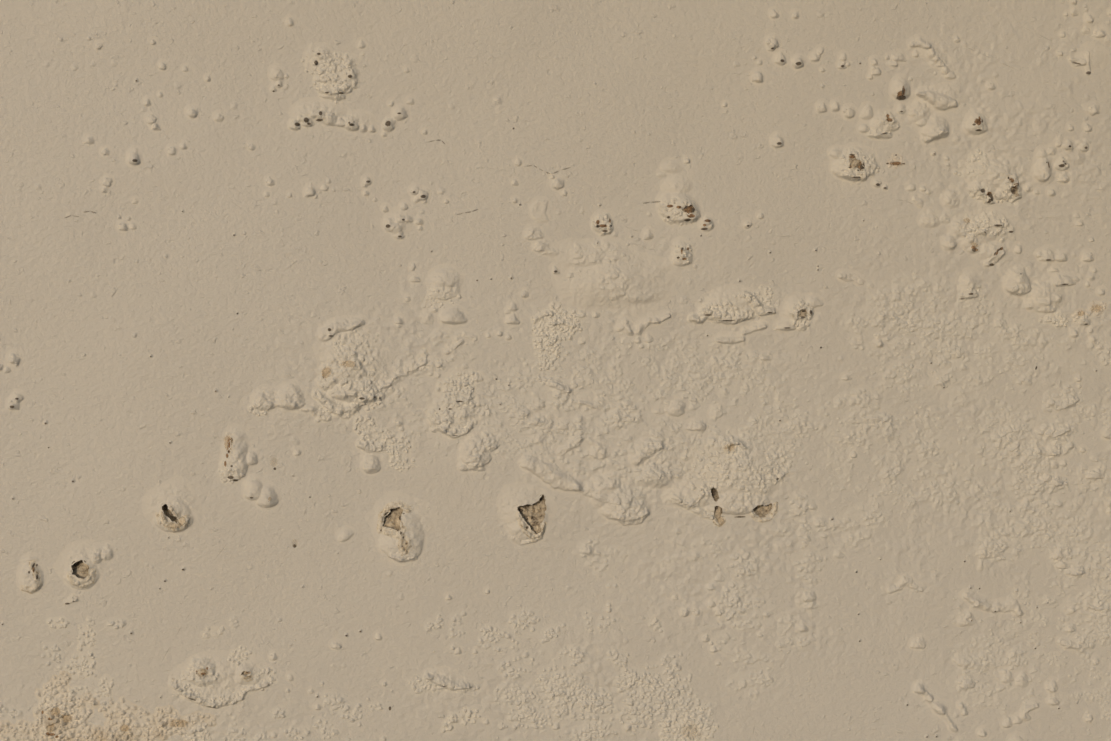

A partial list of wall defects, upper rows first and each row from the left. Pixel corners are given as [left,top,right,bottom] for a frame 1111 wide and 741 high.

peeling [529,300,601,371]
peeling [307,314,419,476]
peeling [660,423,794,527]